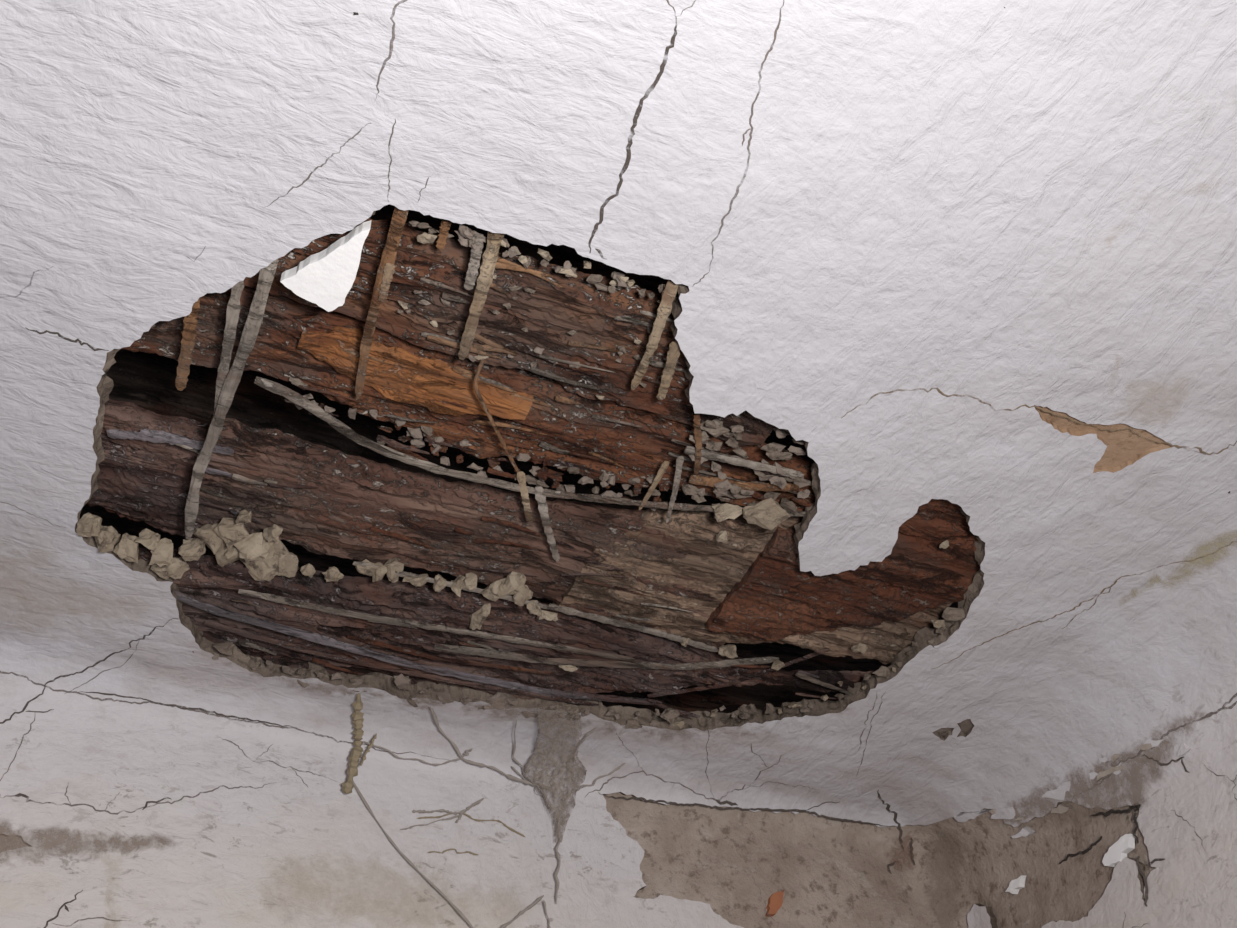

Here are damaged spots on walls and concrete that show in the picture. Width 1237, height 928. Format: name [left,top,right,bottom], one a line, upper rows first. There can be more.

crack [588,0,695,257]
crack [693,0,784,285]
flaking render [280,211,376,312]
flaking render [670,284,689,343]
water stain [0,824,168,860]
crack [0,618,453,815]
flaking render [75,348,492,705]
flaking render [509,506,985,731]
crack [586,695,915,874]
flaking render [603,781,1156,928]
flaking render [1034,405,1172,473]
crack [1059,693,1237,928]